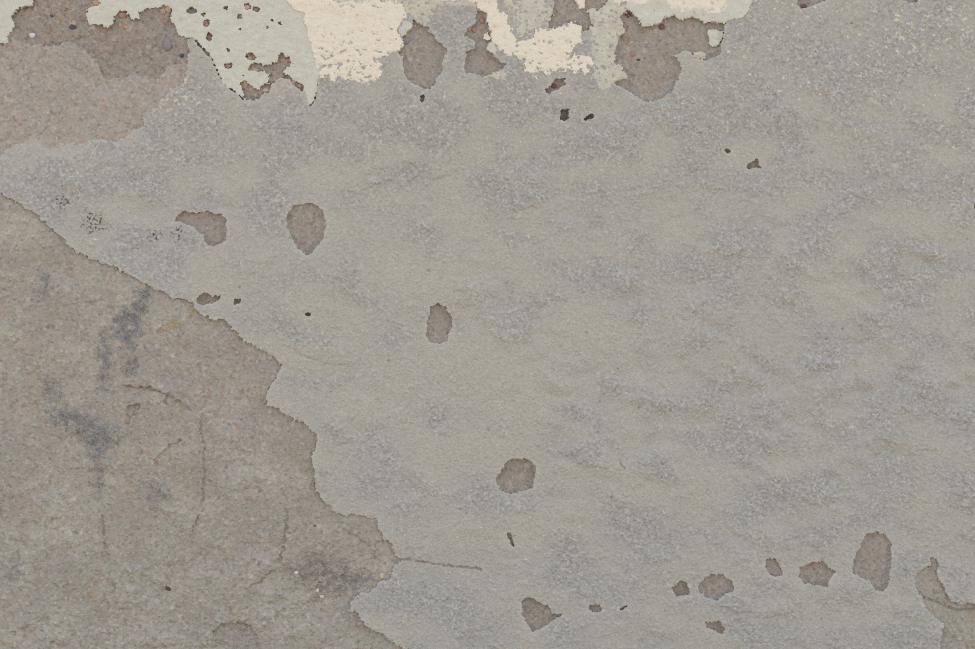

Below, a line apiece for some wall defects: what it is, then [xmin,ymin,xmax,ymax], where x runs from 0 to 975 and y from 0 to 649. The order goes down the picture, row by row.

spalling [0,0,752,157]
spalling [426,303,452,344]
spalling [0,193,402,649]
spalling [496,458,536,494]
spalling [521,597,561,631]
spalling [671,574,734,600]
spalling [705,621,725,633]
spalling [765,558,782,576]
spalling [799,561,835,586]
spalling [852,531,892,591]
spalling [914,557,975,649]